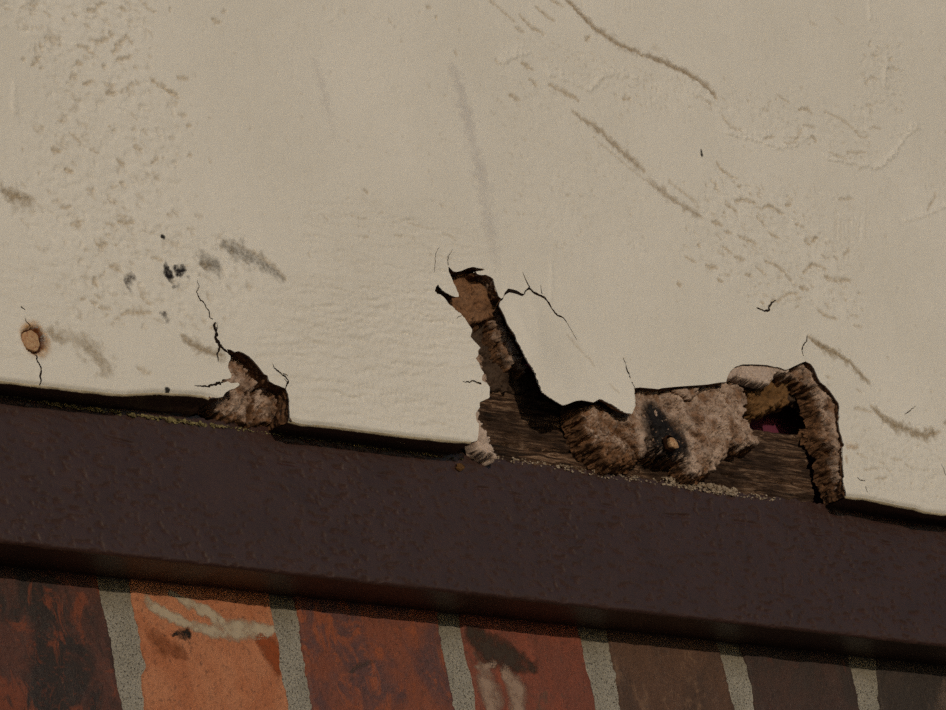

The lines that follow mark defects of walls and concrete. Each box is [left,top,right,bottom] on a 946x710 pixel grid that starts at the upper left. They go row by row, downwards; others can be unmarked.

corrosion [23,324,47,355]
crack [195,281,230,387]
crack [504,274,576,338]
spalling [196,349,292,431]
spalling [435,267,846,505]